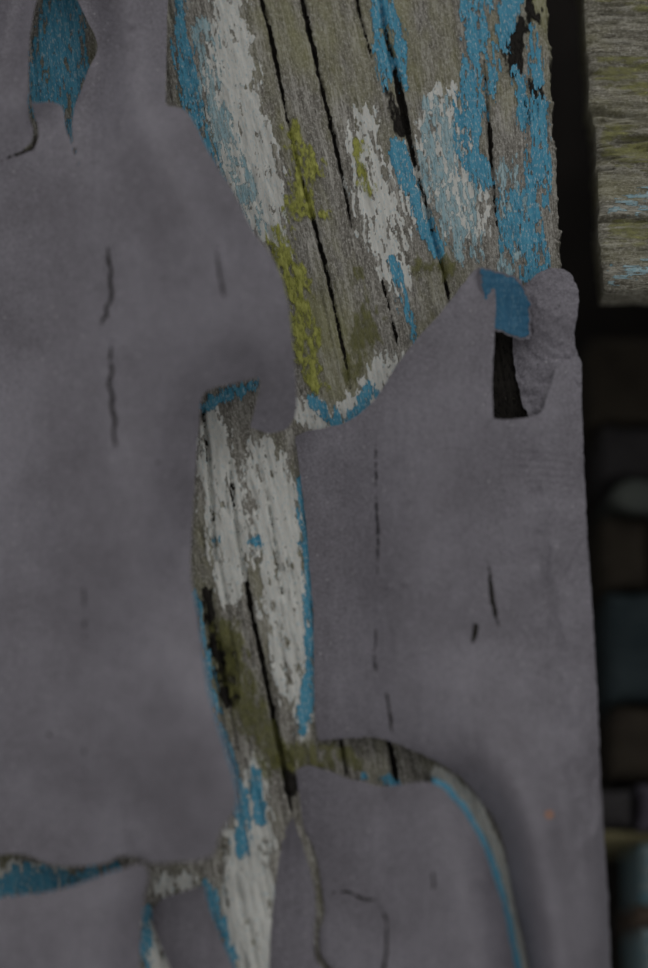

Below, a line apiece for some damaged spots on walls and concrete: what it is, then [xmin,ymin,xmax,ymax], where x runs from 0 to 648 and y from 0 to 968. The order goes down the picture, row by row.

crack [356,0,433,235]
crack [260,0,352,377]
crack [101,247,114,324]
crack [439,261,450,301]
crack [107,346,117,446]
crack [332,890,388,968]